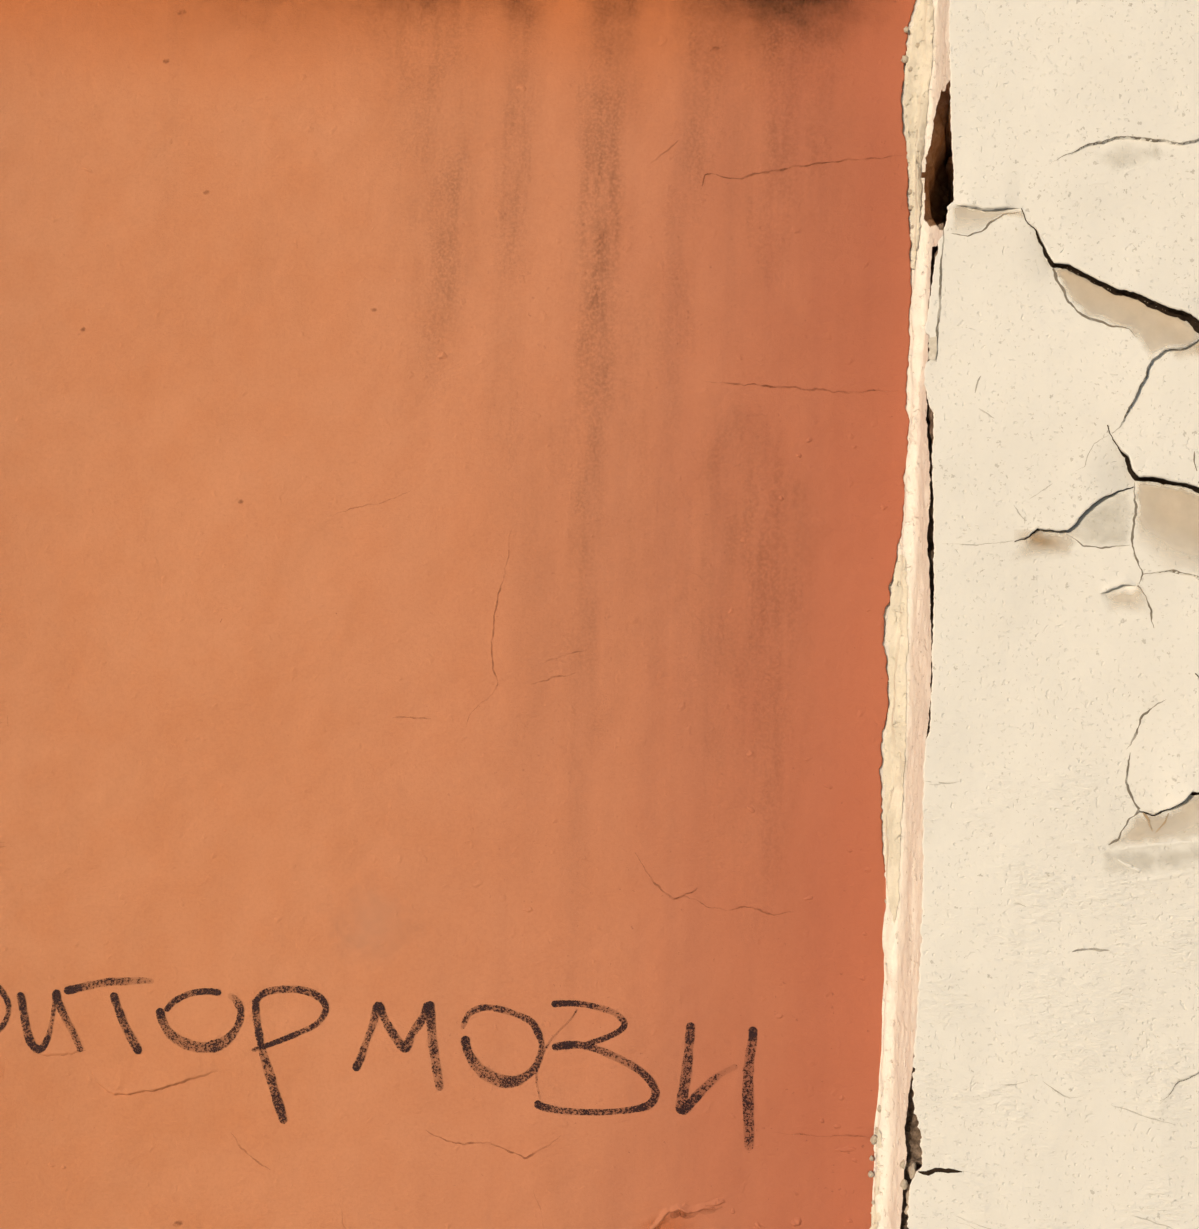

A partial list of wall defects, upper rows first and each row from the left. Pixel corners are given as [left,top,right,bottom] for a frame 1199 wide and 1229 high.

crack [700,155,882,185]
peeling [903,0,1199,347]
crack [928,223,945,361]
peeling [1015,425,1199,549]
crack [926,392,934,738]
peeling [1100,575,1154,627]
peeling [1065,755,1199,886]